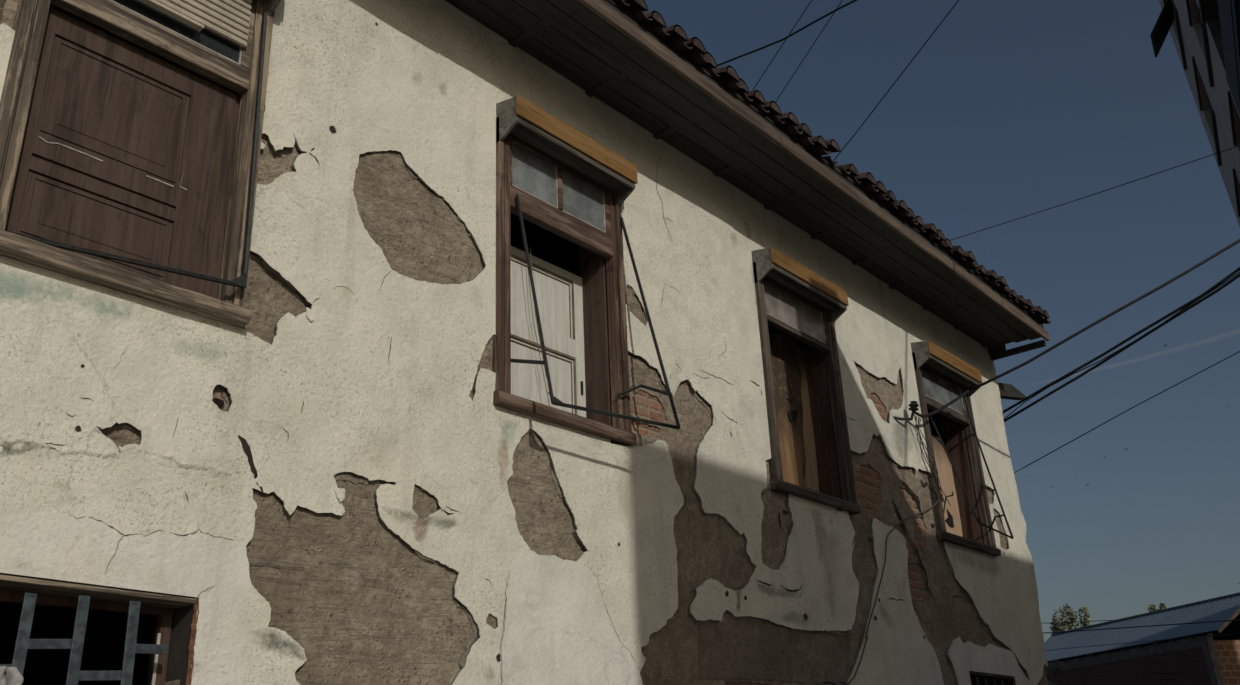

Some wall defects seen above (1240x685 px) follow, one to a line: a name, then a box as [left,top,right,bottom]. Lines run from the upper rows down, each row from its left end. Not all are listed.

flaking render [0,0,19,29]
flaking render [257,133,307,185]
flaking render [353,150,486,284]
flaking render [242,250,316,345]
flaking render [96,422,142,448]
flaking render [212,385,232,412]
flaking render [507,428,588,561]
flaking render [611,351,1048,685]
flaking render [246,472,498,685]